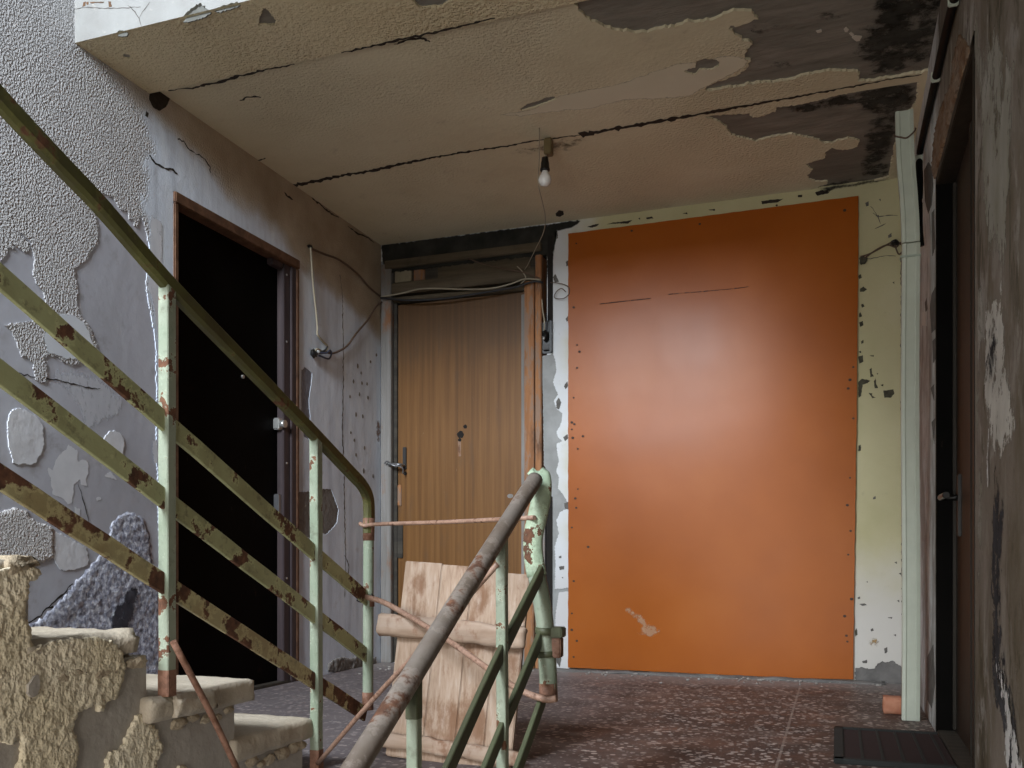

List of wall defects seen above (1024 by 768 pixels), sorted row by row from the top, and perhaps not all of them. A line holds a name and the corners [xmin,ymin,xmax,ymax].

crack [149,138,211,175]
crack [168,64,295,101]
crack [341,18,495,53]
crack [284,74,921,243]
spalling [578,0,940,196]
water stain [792,85,915,190]
mould [859,0,941,74]
water stain [985,325,998,378]
flaking render [0,388,158,568]
flaking render [542,354,568,626]
flaking render [0,492,126,768]
water stain [987,429,1022,768]